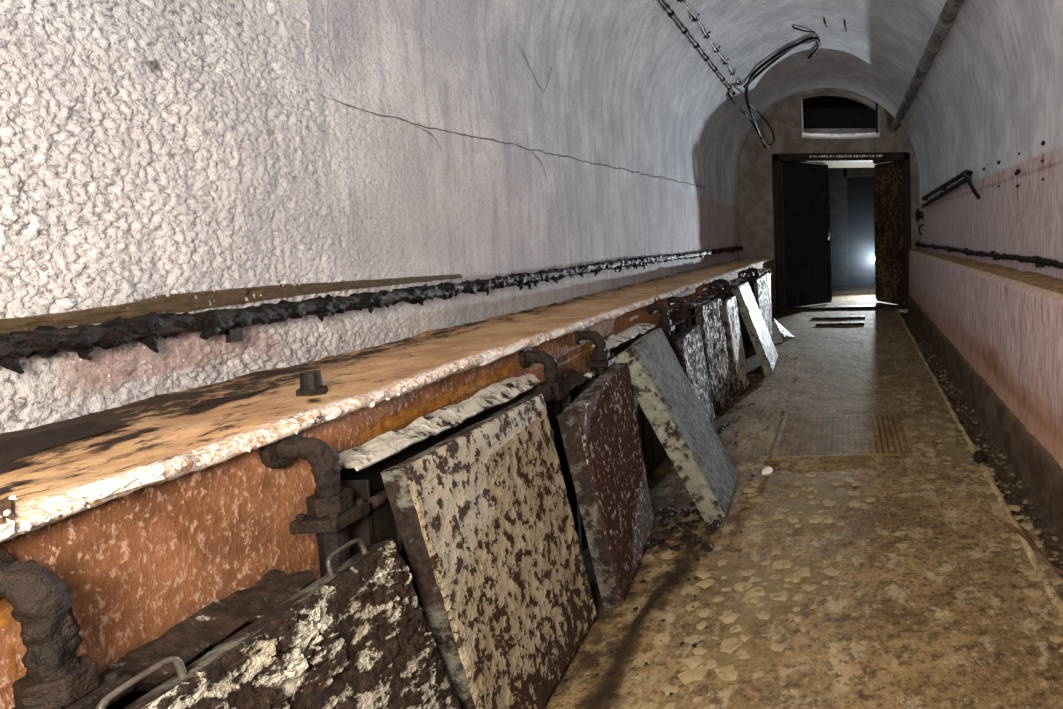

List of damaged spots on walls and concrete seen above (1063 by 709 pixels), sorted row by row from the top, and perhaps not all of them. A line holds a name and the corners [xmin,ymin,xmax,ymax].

crack [318,0,706,188]
peeling [453,257,776,372]
peeling [370,376,428,407]
peeling [280,406,342,434]
peeling [54,464,181,508]
peeling [0,495,50,540]
corrosion [0,597,16,627]